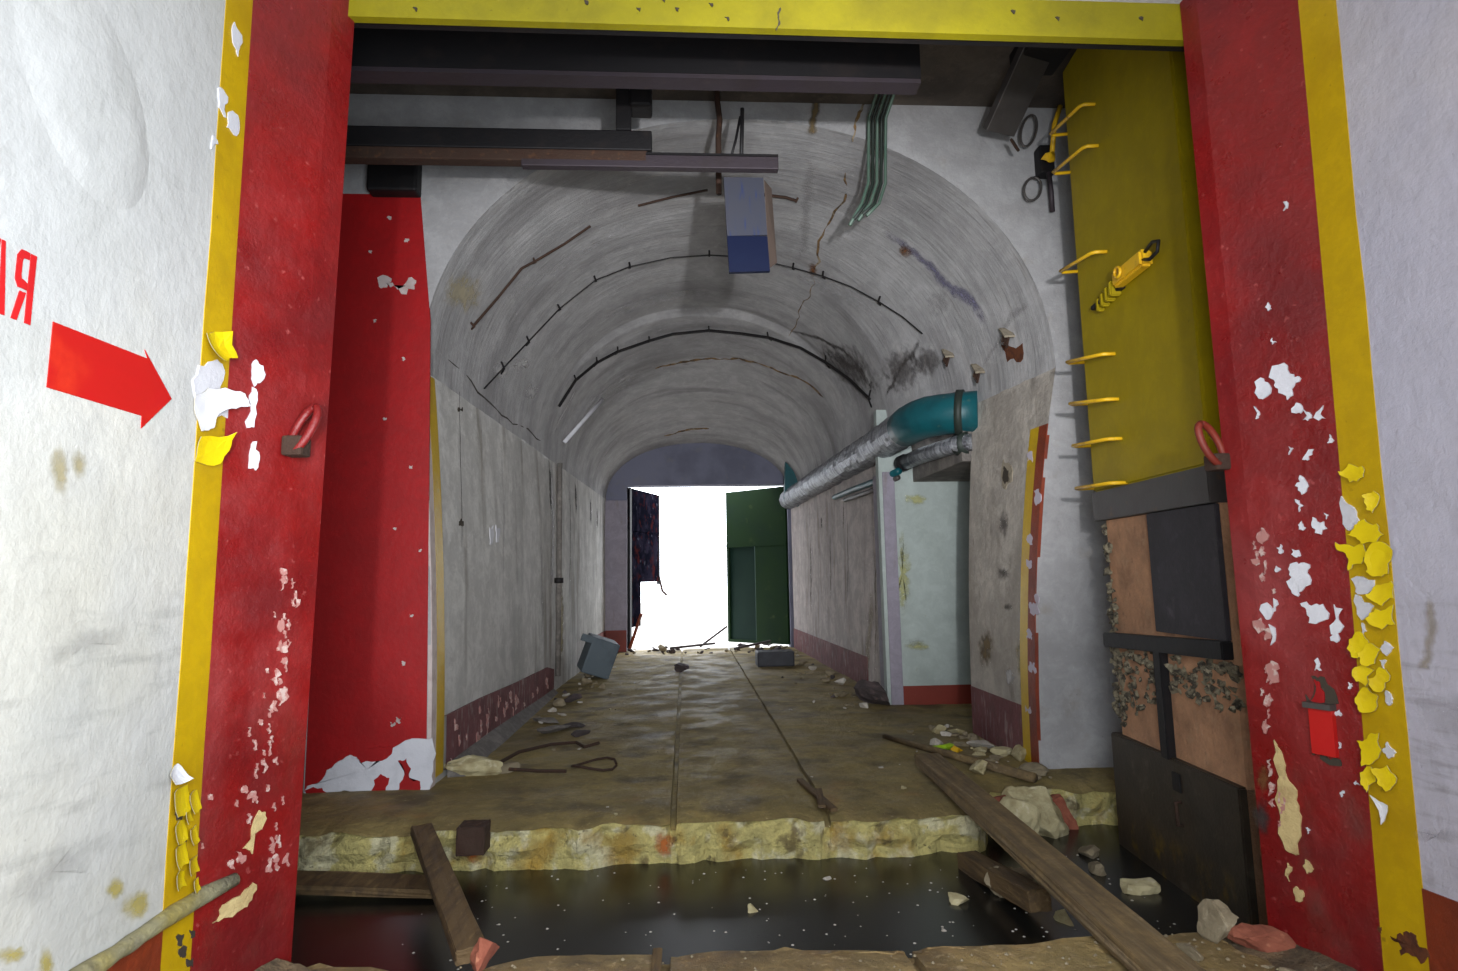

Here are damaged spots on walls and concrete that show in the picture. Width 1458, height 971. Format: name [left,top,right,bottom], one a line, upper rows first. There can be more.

peeling [377,275,416,295]
crack [789,104,865,335]
peeling [191,331,266,470]
peeling [1101,363,1397,902]
peeling [213,568,301,923]
flaking render [304,677,549,793]
peeling [170,763,213,894]
peeling [176,930,195,967]